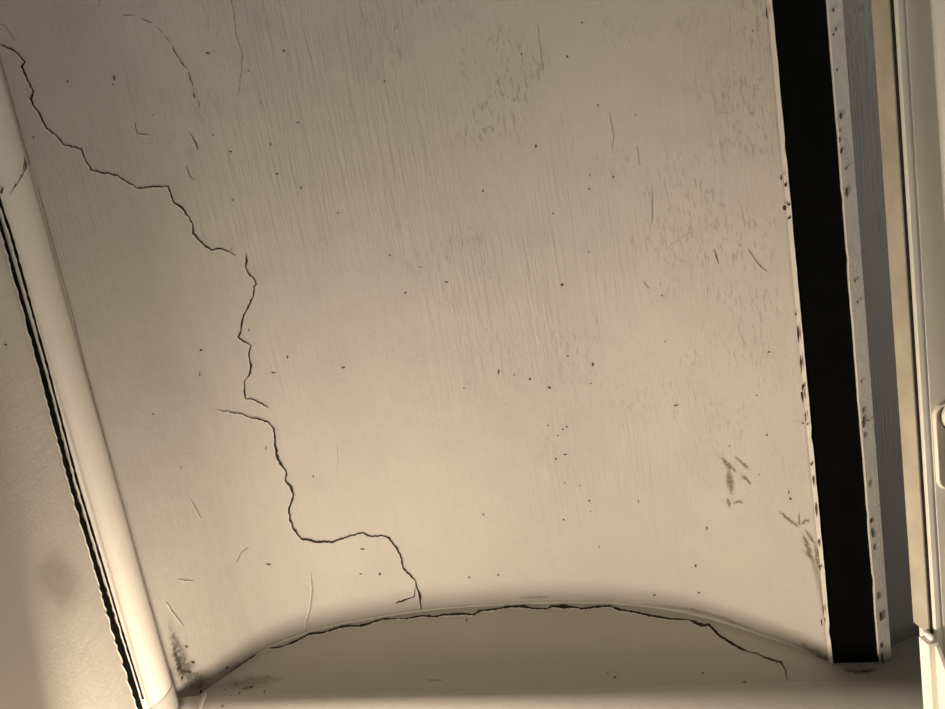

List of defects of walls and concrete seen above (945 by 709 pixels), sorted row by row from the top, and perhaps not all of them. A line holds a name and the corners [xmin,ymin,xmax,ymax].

crack [0,13,788,681]